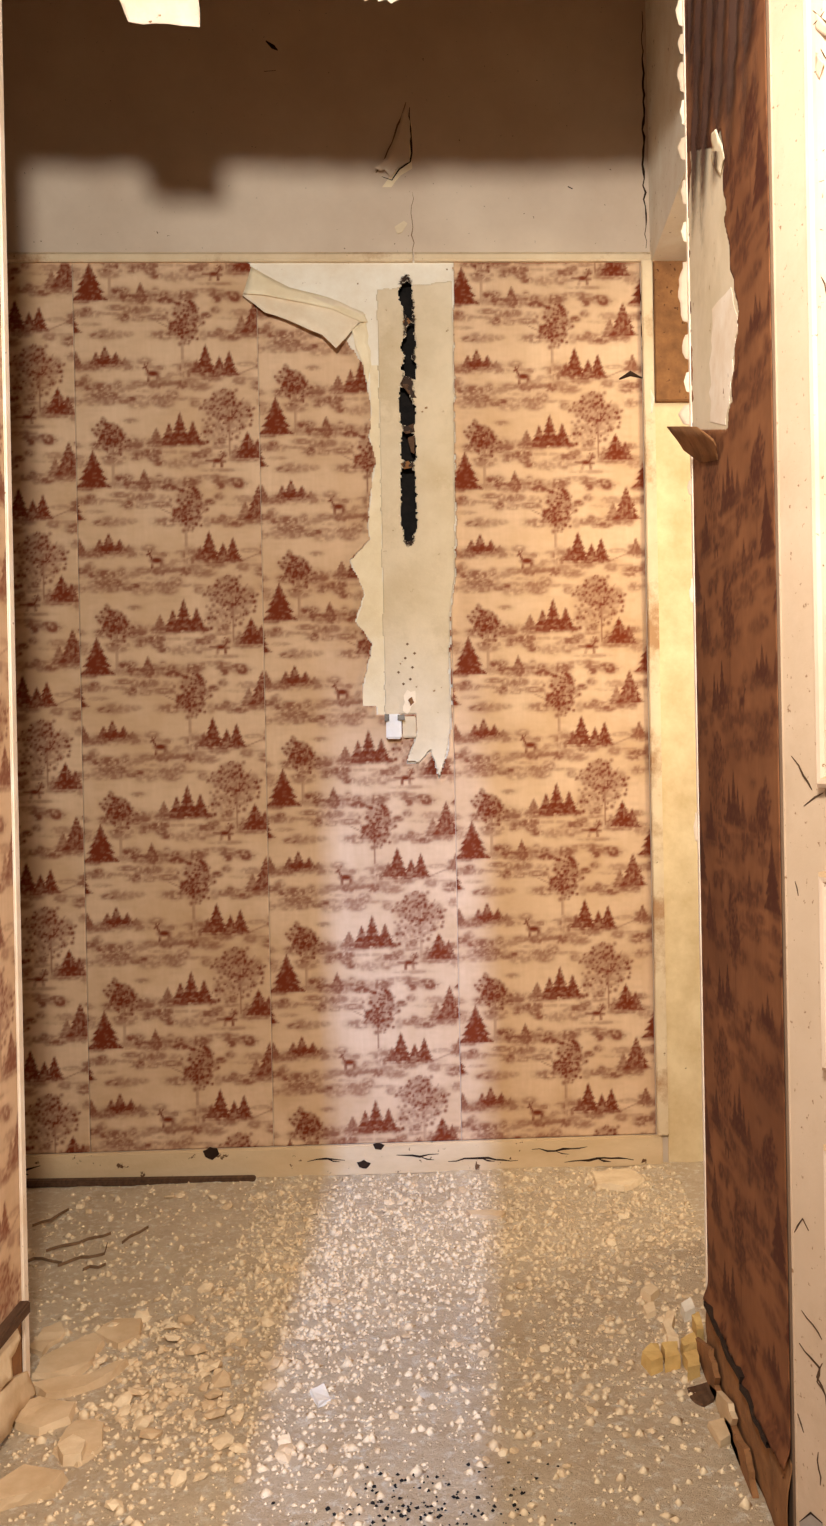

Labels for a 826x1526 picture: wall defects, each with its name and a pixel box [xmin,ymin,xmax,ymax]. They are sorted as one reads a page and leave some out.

flaking render [675,0,739,430]
flaking render [248,261,454,688]
flaking render [407,502,457,778]
crack [791,756,824,806]
crack [797,1310,826,1485]